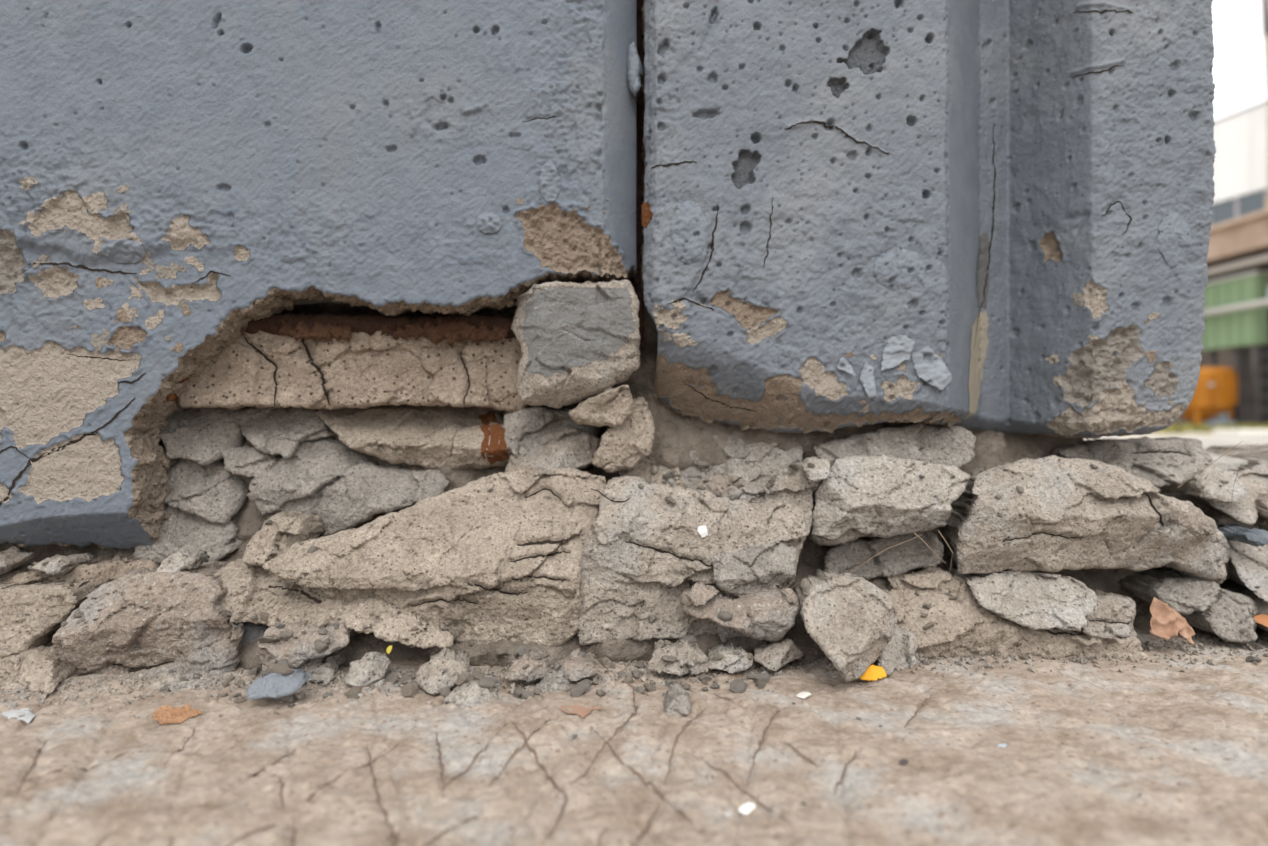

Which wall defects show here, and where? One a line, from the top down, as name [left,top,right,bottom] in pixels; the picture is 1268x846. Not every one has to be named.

crack [785,121,889,154]
spalling [0,0,646,552]
crack [974,123,996,346]
spalling [1039,232,1062,262]
peeling [1071,281,1109,319]
crack [244,337,278,406]
crack [302,338,330,405]
crack [460,353,470,404]
peeling [652,289,981,434]
spalling [1019,313,1185,439]
spalling [0,542,114,576]
spalling [155,549,210,573]